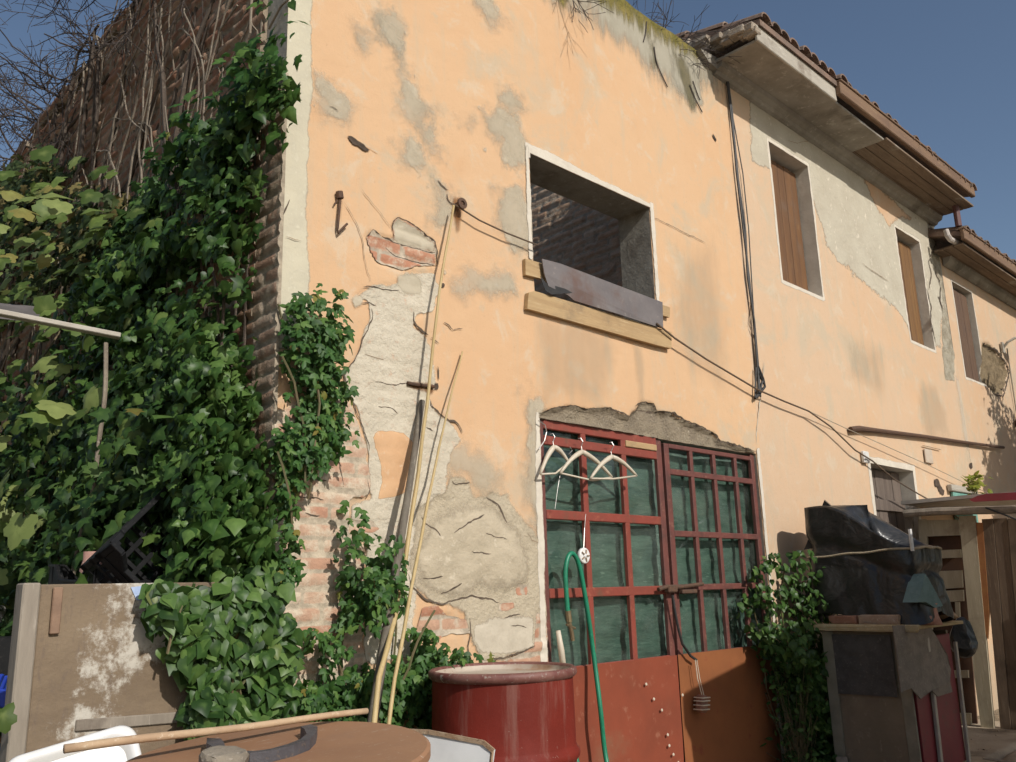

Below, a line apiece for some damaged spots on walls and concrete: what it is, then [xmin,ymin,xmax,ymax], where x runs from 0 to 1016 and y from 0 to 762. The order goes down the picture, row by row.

water stain [552,0,713,105]
spalling [348,136,377,152]
peeling [398,72,435,169]
peeling [487,92,526,167]
peeling [435,178,452,225]
peeling [499,185,532,253]
spalling [927,223,955,381]
flaking render [272,217,548,689]